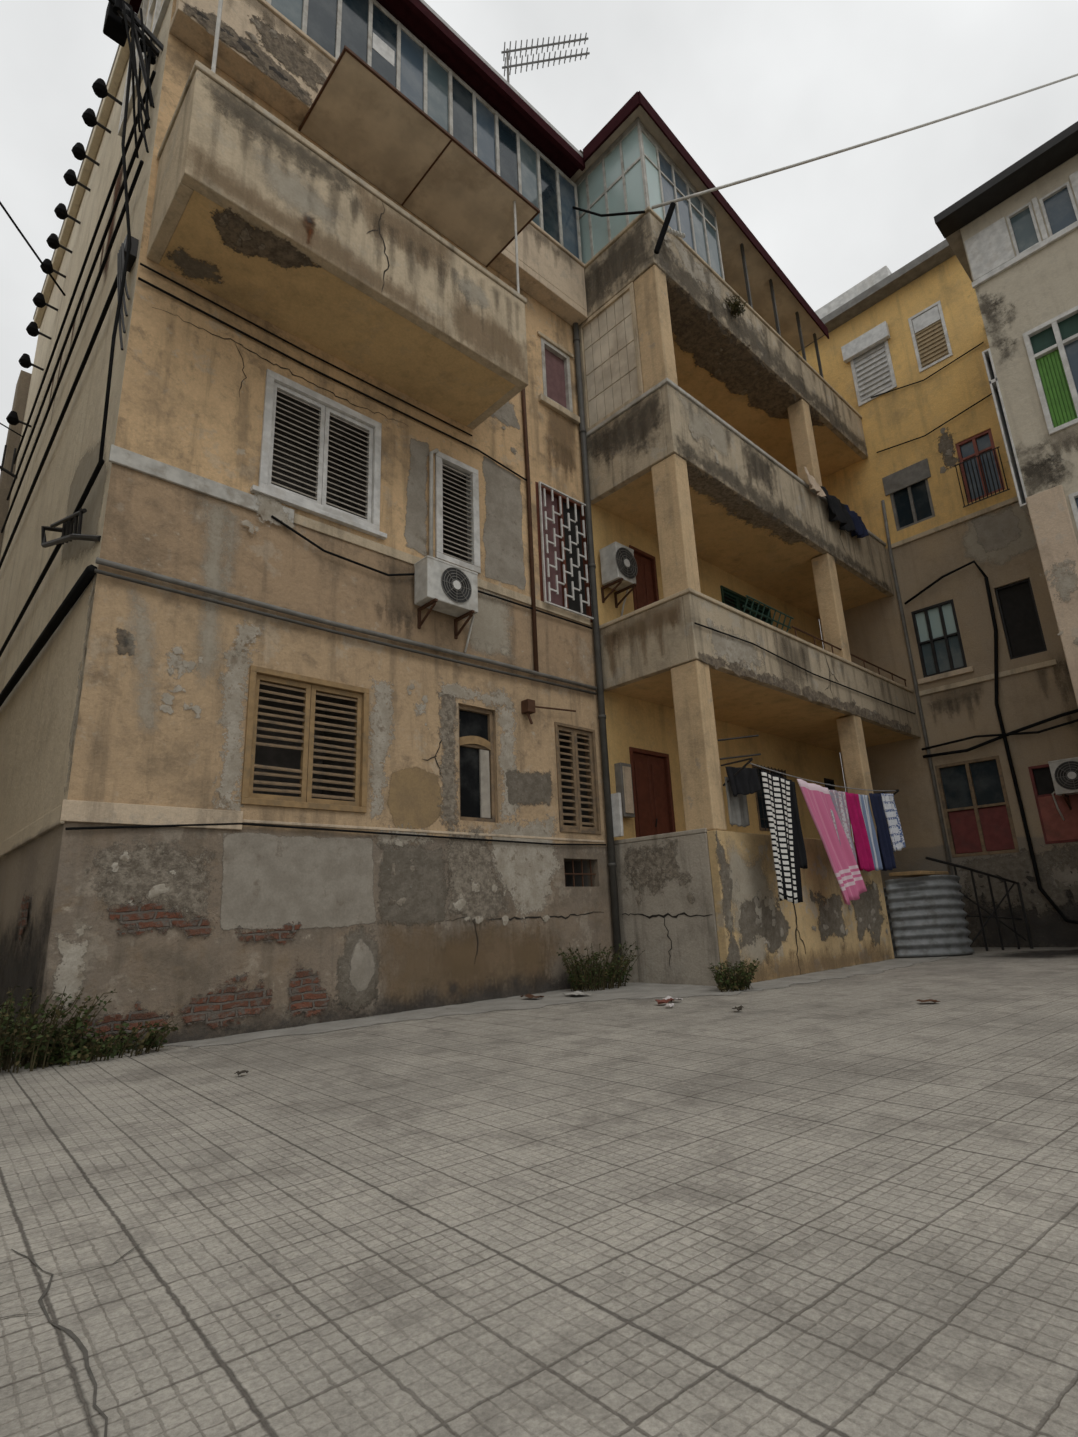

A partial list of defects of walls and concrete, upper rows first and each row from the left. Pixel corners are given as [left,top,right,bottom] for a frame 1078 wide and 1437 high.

spalling [183,3,327,106]
leakage [212,87,447,261]
spalling [210,208,321,270]
crack [367,203,390,290]
leakage [455,303,524,376]
spalling [664,235,825,426]
leakage [548,395,660,467]
leakage [680,441,889,589]
flaking render [52,921,330,1049]
crack [447,912,712,965]
flaking render [810,881,888,946]
crack [0,1243,141,1437]